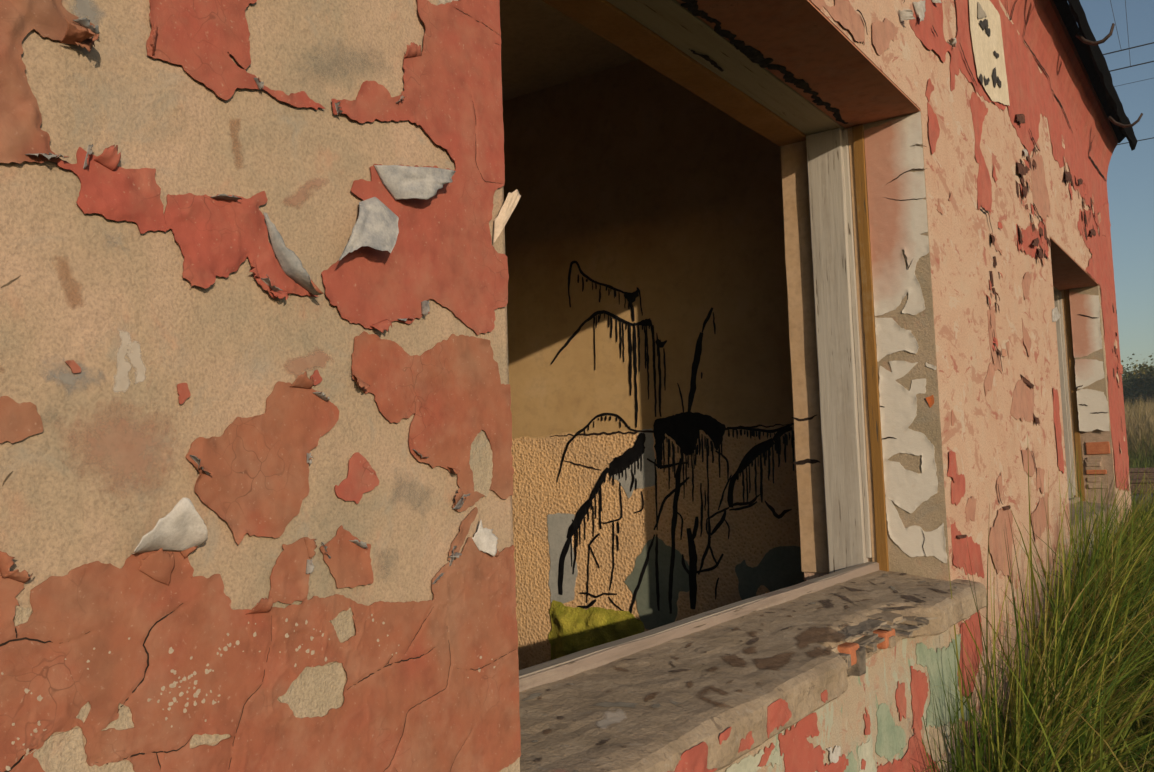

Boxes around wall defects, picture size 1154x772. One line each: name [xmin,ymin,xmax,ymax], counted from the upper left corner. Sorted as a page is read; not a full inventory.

peeling [0,0,521,772]
peeling [864,78,1013,583]
peeling [872,0,1129,505]
crack [0,627,51,646]
crack [96,736,192,769]
crack [108,603,183,725]
crack [347,610,516,771]
peeling [547,513,578,603]
spalling [667,611,983,772]
peeling [1022,447,1050,543]